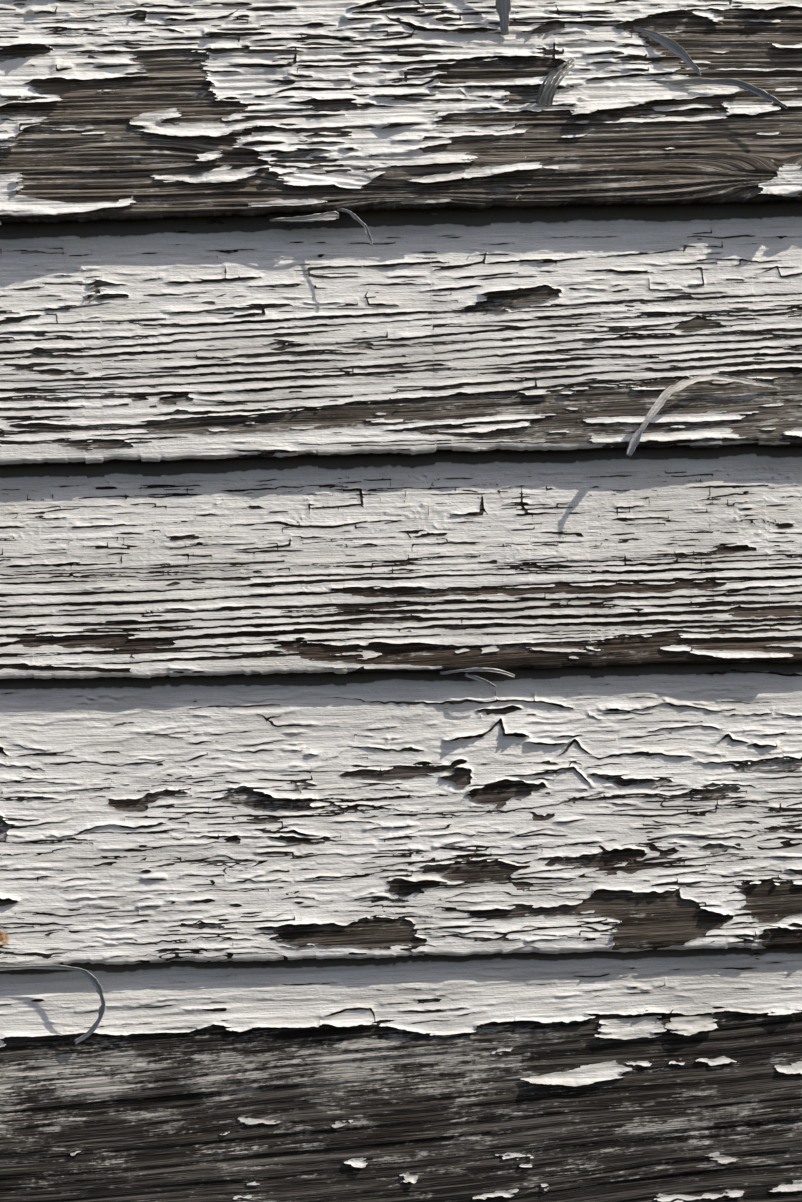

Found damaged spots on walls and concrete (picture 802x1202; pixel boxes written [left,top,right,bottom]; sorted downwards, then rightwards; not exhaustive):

peeling [0,7,802,220]
crack [0,250,802,433]
peeling [9,367,802,451]
crack [0,485,802,667]
peeling [274,604,802,673]
crack [707,669,802,677]
crack [0,693,802,882]
peeling [340,759,547,809]
crack [124,931,254,945]
peeling [257,917,427,949]
peeling [470,869,802,950]
peeling [0,1011,802,1202]